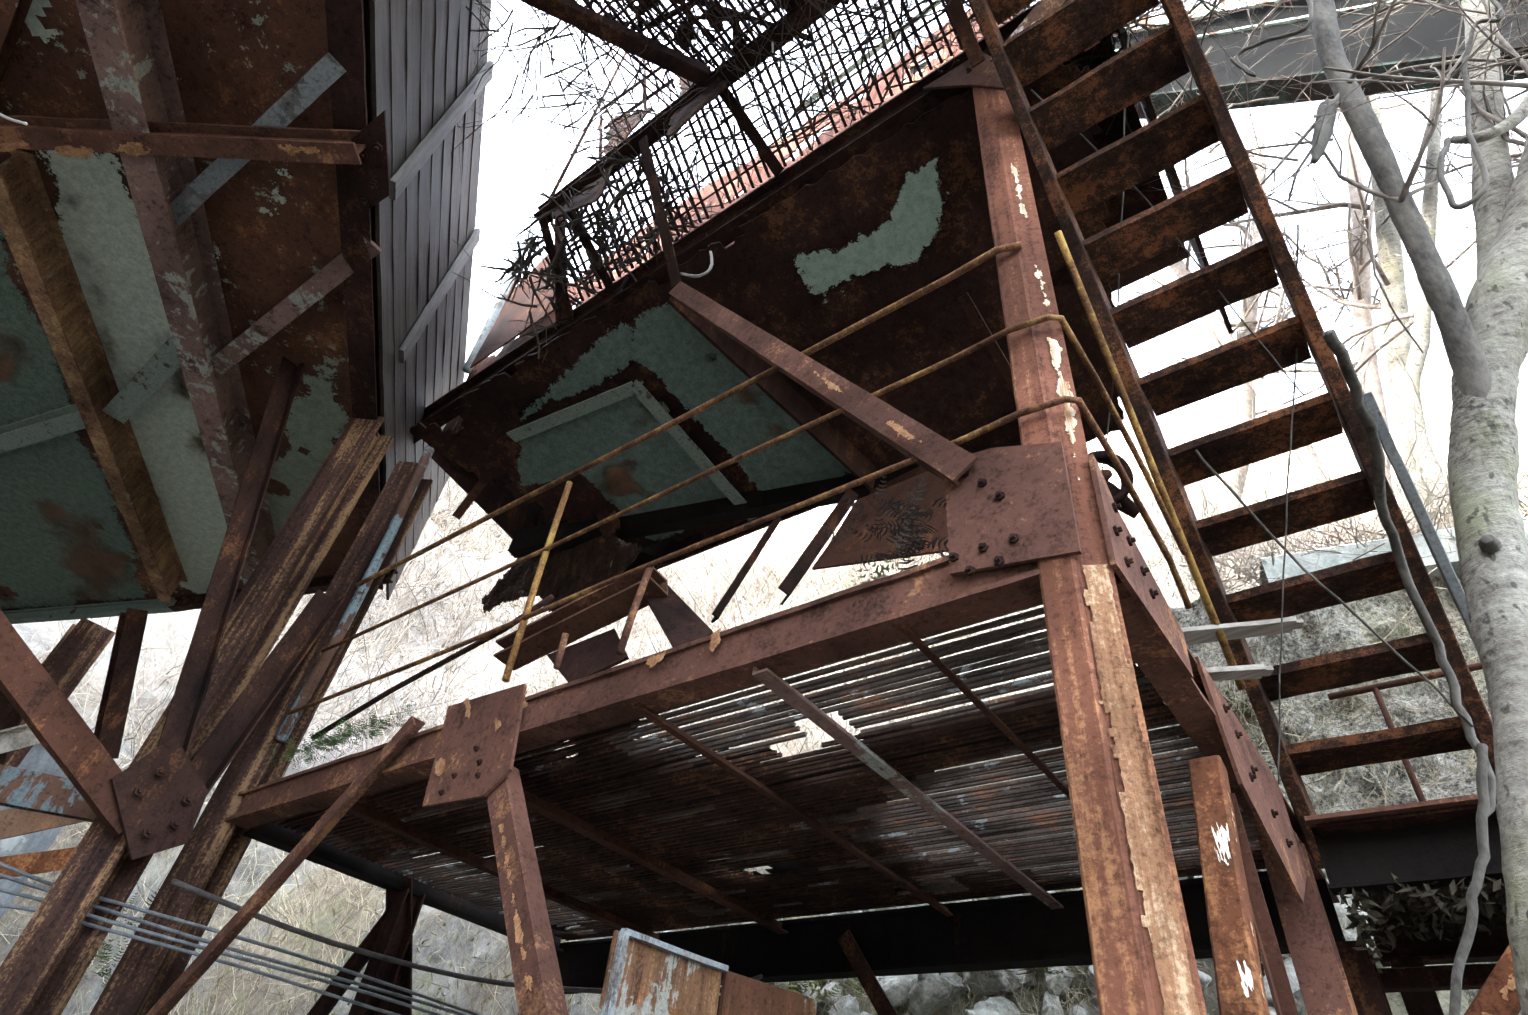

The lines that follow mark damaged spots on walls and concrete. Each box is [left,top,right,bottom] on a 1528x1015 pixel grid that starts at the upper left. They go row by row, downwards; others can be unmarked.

corrosion [0,140,29,155]
corrosion [54,145,94,160]
corrosion [117,142,151,157]
corrosion [278,144,320,156]
peeling [794,157,949,303]
peeling [517,302,851,516]
peeling [886,420,922,442]
peeling [1211,822,1231,866]
peeling [1237,961,1254,997]